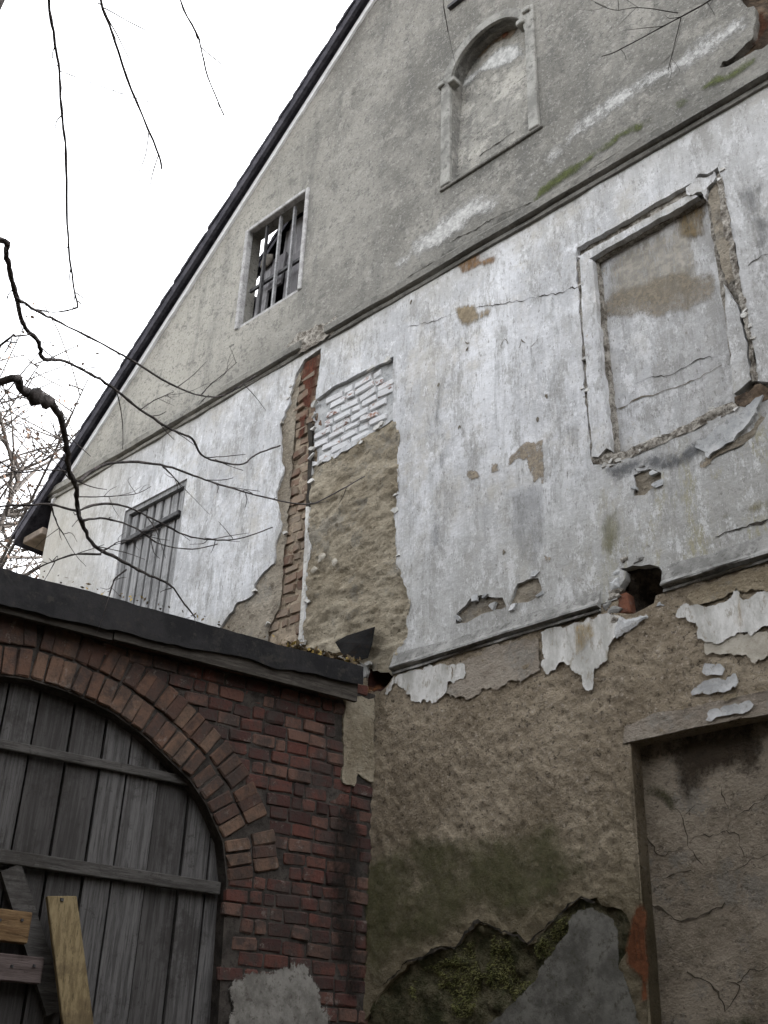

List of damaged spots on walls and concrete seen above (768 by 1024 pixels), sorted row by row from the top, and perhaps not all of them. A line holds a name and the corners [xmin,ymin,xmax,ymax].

water stain [568,19,745,139]
water stain [397,196,518,265]
flaking render [576,167,768,496]
crack [618,356,721,409]
flaking render [222,353,394,647]
peeling [491,440,544,483]
flaking render [365,555,669,703]
flaking render [676,566,768,722]
crack [647,786,768,879]
crack [652,902,725,922]
crack [687,967,768,1011]